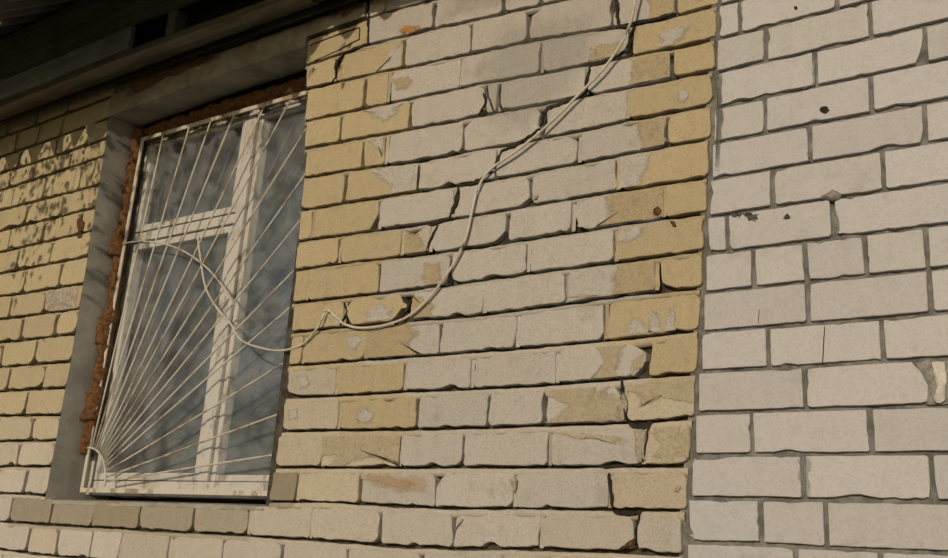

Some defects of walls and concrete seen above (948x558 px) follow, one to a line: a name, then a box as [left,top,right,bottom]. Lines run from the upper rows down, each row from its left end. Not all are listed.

peeling [648,0,674,19]
crack [304,0,370,91]
peeling [629,24,690,84]
crack [425,0,677,255]
peeling [368,137,418,193]
peeling [596,116,664,243]
peeling [611,261,654,295]
peeling [346,296,433,358]
crack [394,298,412,325]
peeling [545,309,694,463]
spalling [915,360,948,405]
crack [599,377,652,549]